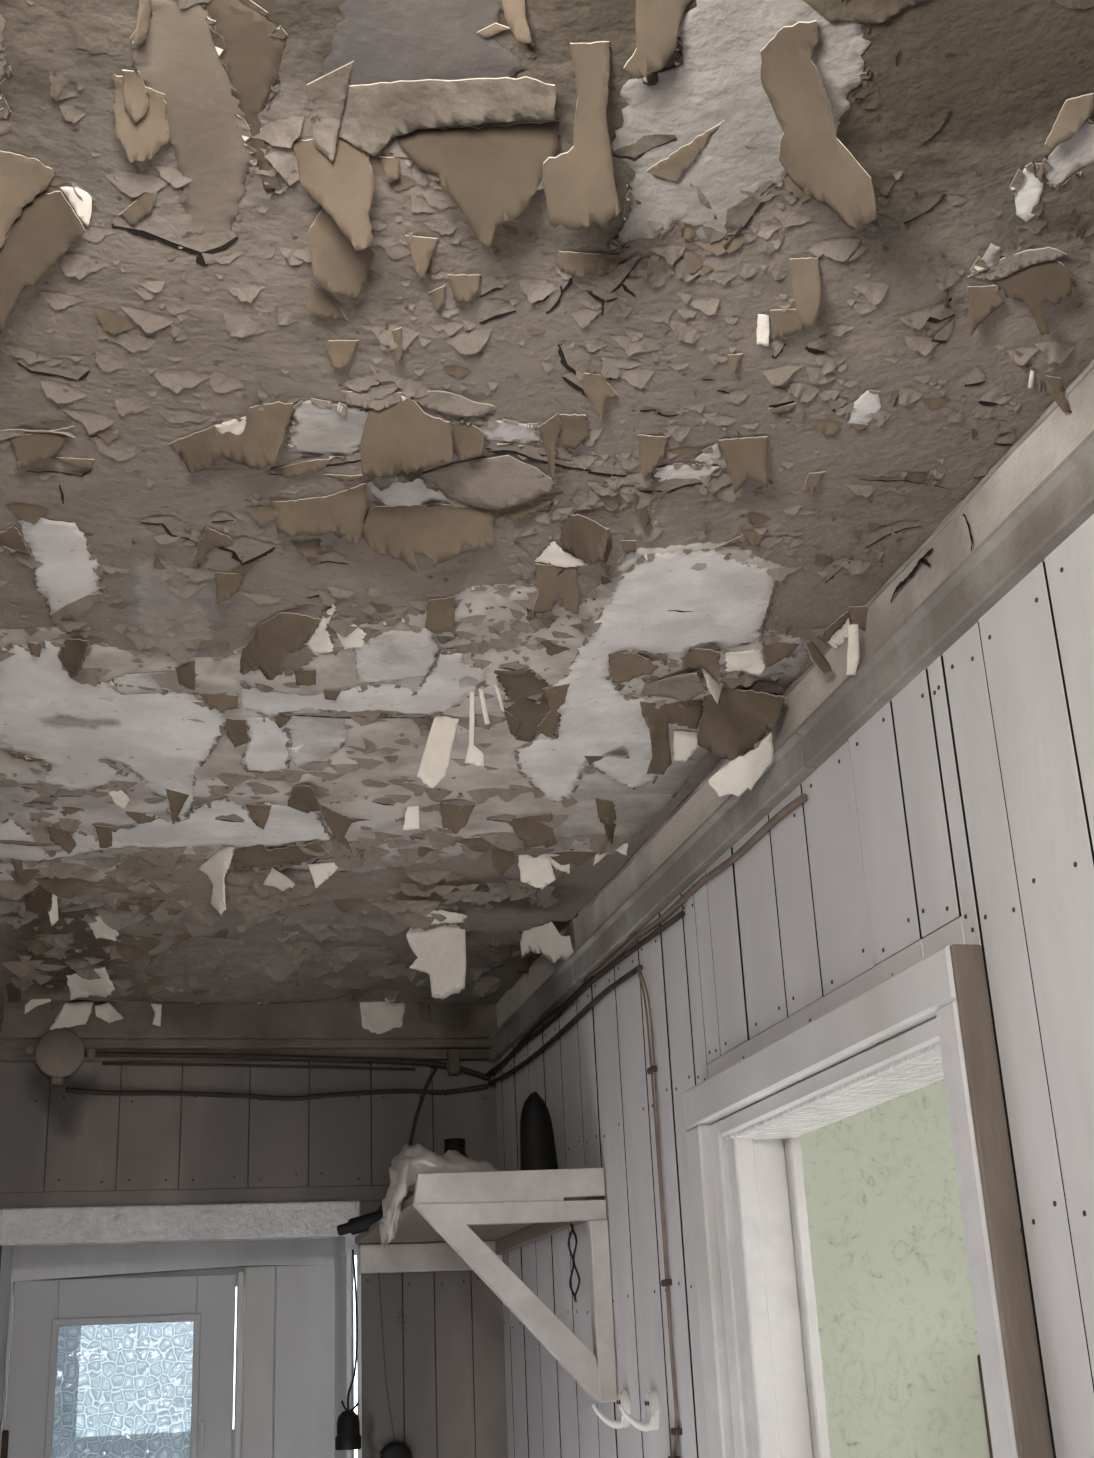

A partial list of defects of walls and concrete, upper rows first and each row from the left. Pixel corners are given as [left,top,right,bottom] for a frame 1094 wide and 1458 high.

flaking render [0,0,1094,1034]